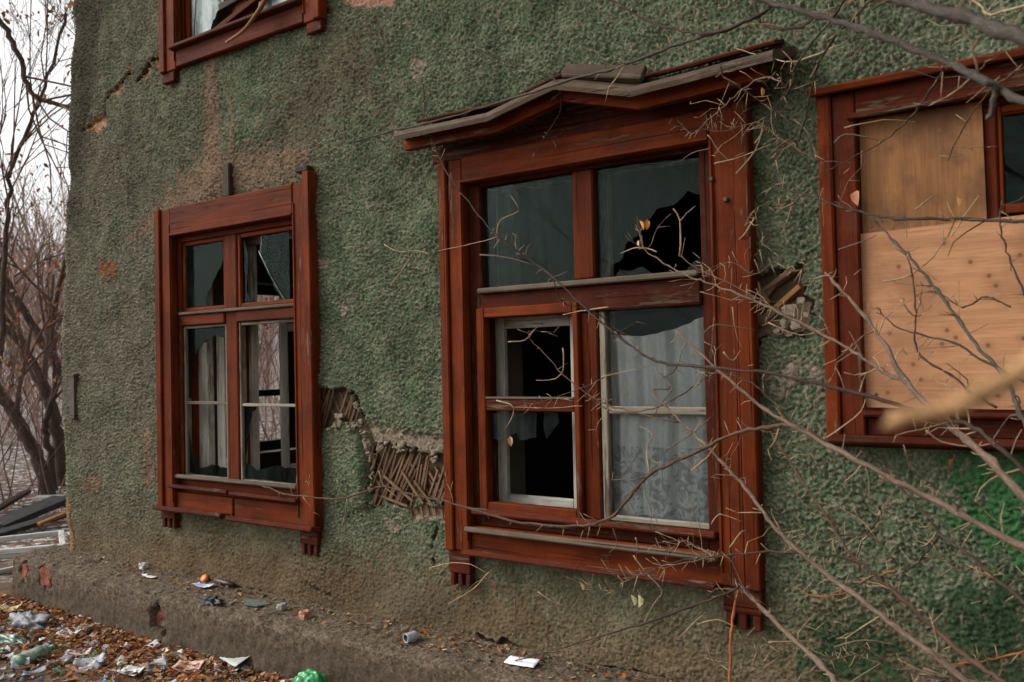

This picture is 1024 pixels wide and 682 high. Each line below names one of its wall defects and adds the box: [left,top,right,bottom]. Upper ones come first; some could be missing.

spalling [327,0,395,14]
crack [83,57,159,134]
spalling [757,264,825,412]
spalling [321,387,445,534]
spalling [21,563,54,588]